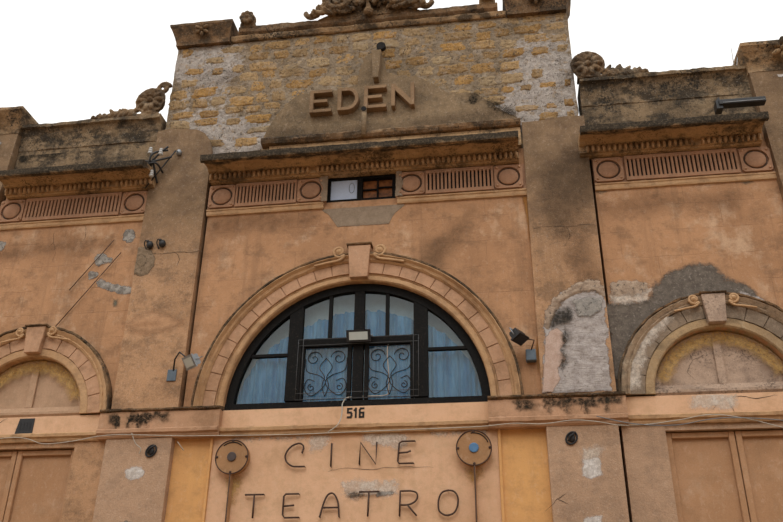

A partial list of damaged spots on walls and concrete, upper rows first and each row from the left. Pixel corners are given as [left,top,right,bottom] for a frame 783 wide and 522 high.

peeling [542,263,764,393]
water stain [544,396,621,414]
water stain [109,411,168,429]